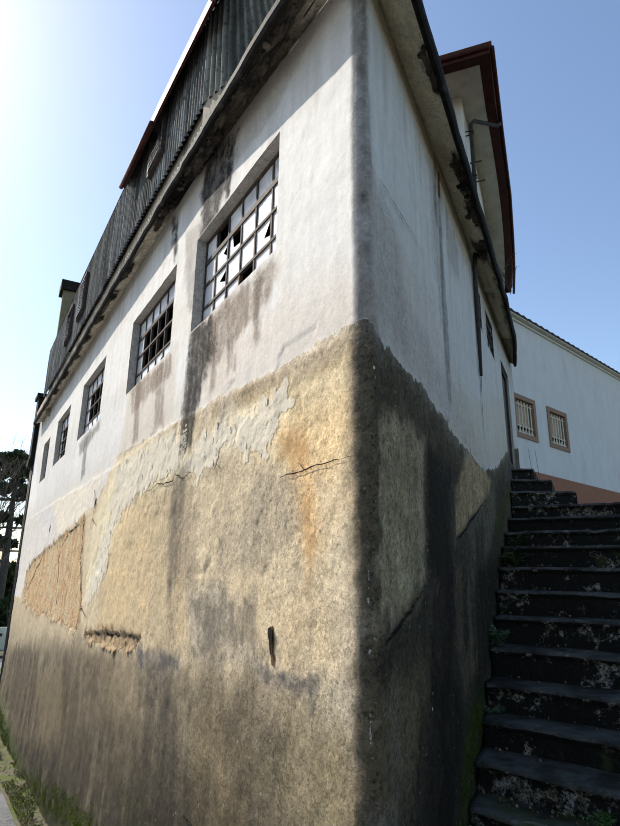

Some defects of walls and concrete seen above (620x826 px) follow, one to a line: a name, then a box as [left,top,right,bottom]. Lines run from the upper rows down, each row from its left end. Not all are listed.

spalling [417,44,439,95]
leakage [200,129,239,235]
spalling [449,152,480,227]
leakage [179,272,270,454]
crack [280,456,349,478]
spalling [22,377,295,662]
crack [457,497,489,540]
crack [386,585,427,647]